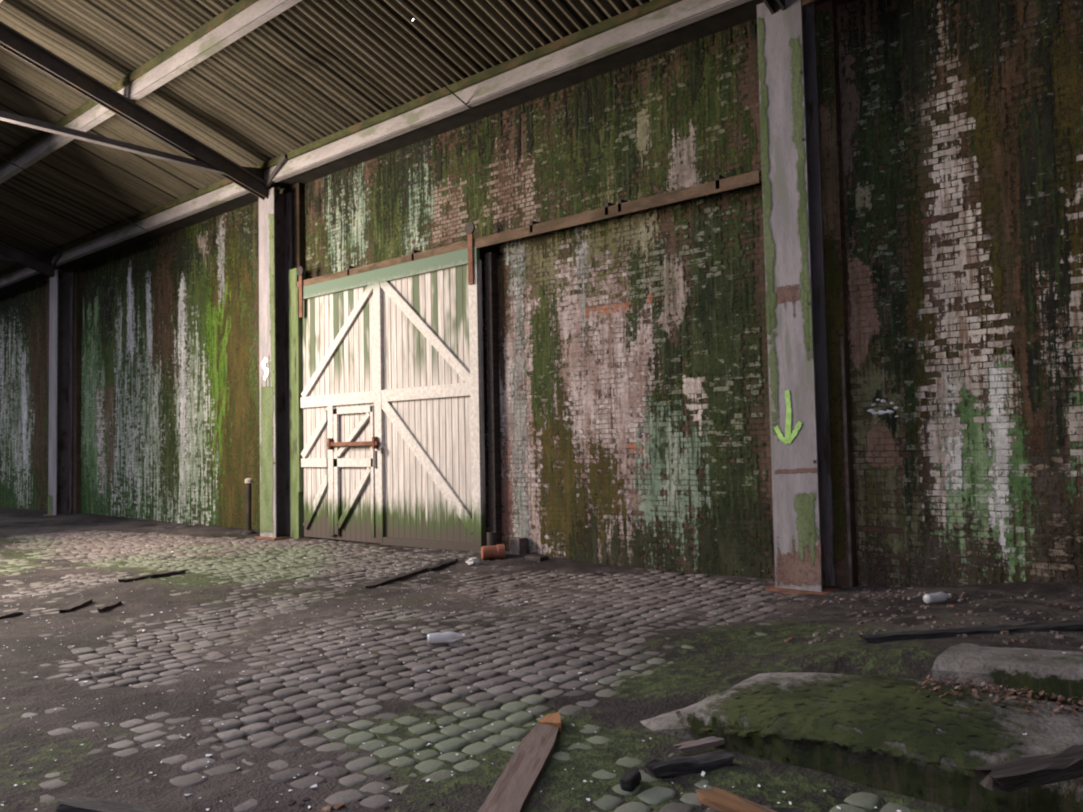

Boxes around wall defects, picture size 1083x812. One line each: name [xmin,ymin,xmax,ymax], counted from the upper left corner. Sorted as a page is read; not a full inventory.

water stain [304,18,758,273]
spalling [919,2,968,156]
water stain [0,283,44,509]
water stain [82,201,259,526]
spalling [581,288,688,319]
peeling [682,375,708,438]
water stain [838,0,1083,587]